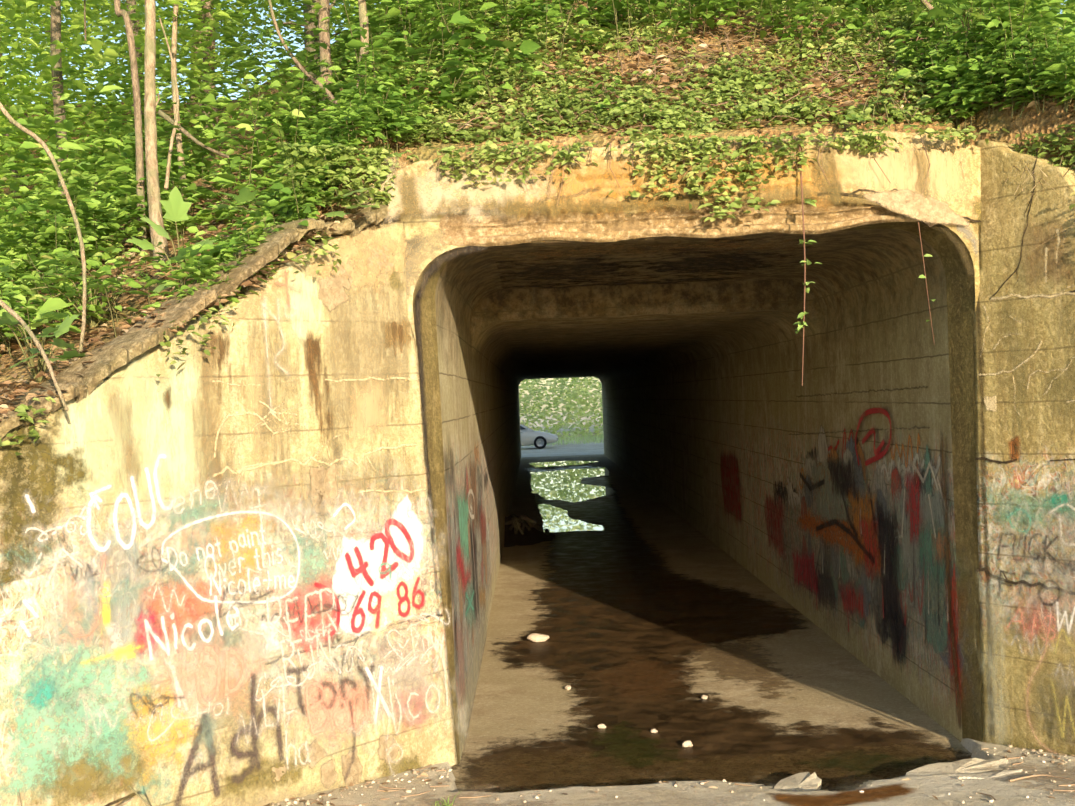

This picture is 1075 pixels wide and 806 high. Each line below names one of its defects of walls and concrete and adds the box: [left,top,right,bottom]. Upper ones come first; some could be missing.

spalling [863,190,969,226]
crack [979,148,1075,415]
corrosion [305,334,330,430]